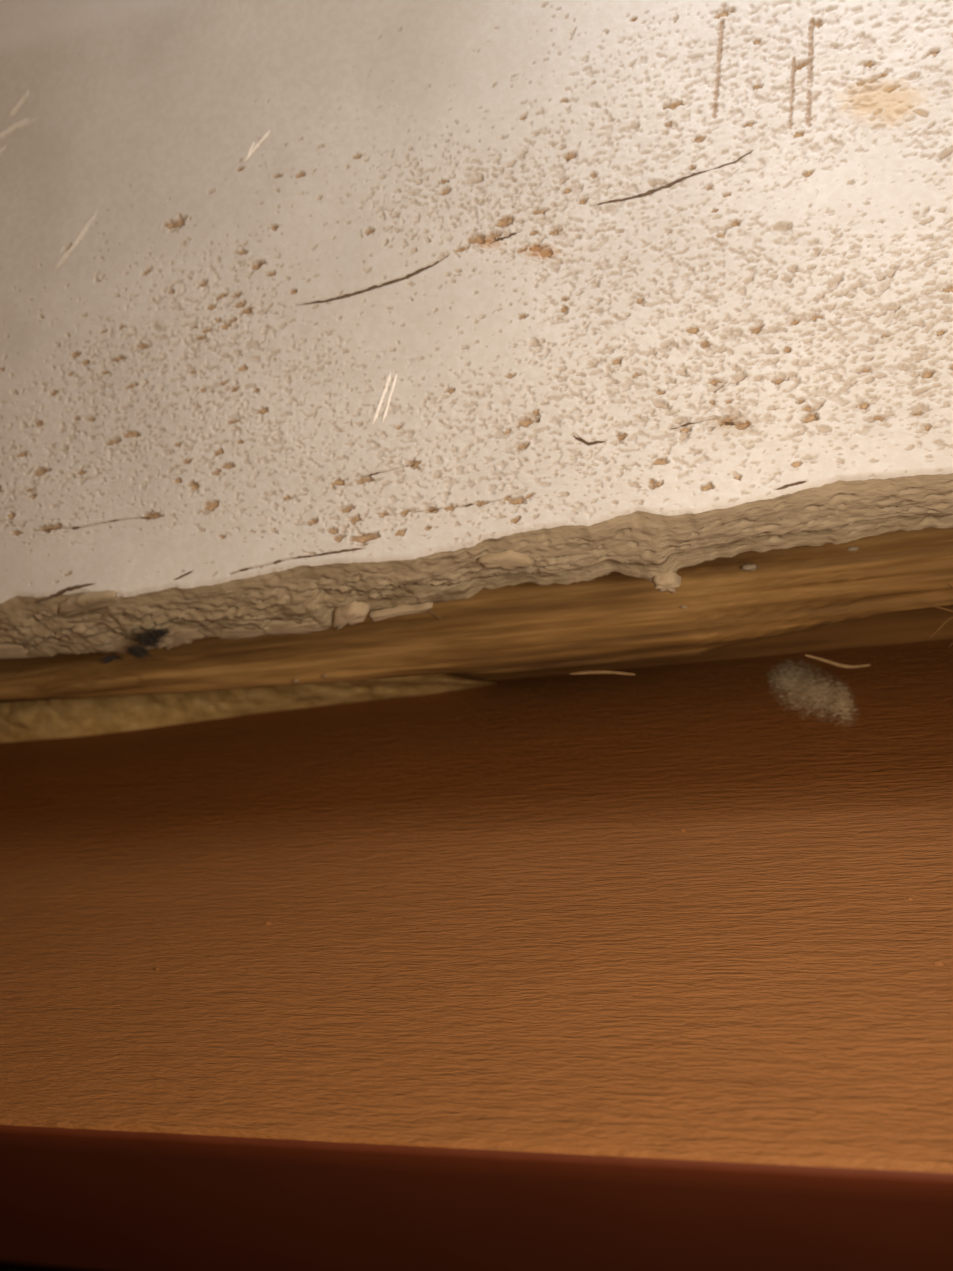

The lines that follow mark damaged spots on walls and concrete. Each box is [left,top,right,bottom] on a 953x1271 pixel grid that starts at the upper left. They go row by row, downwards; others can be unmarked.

crack [594,150,753,206]
crack [302,255,448,305]